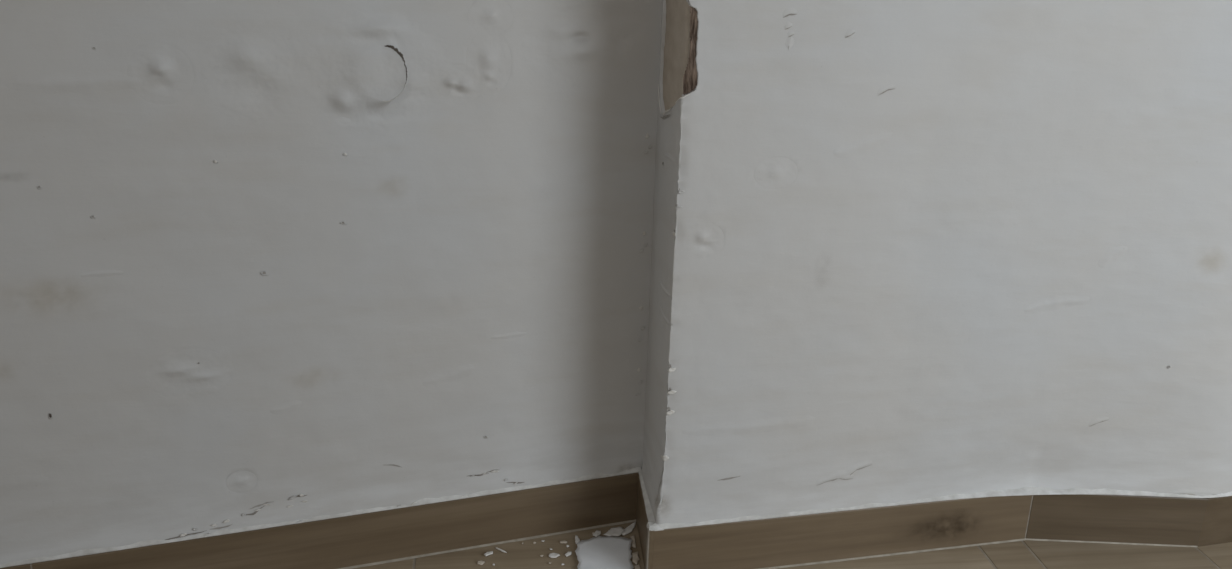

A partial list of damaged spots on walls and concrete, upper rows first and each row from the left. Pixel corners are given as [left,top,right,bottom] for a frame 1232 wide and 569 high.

peeling [658,0,705,120]